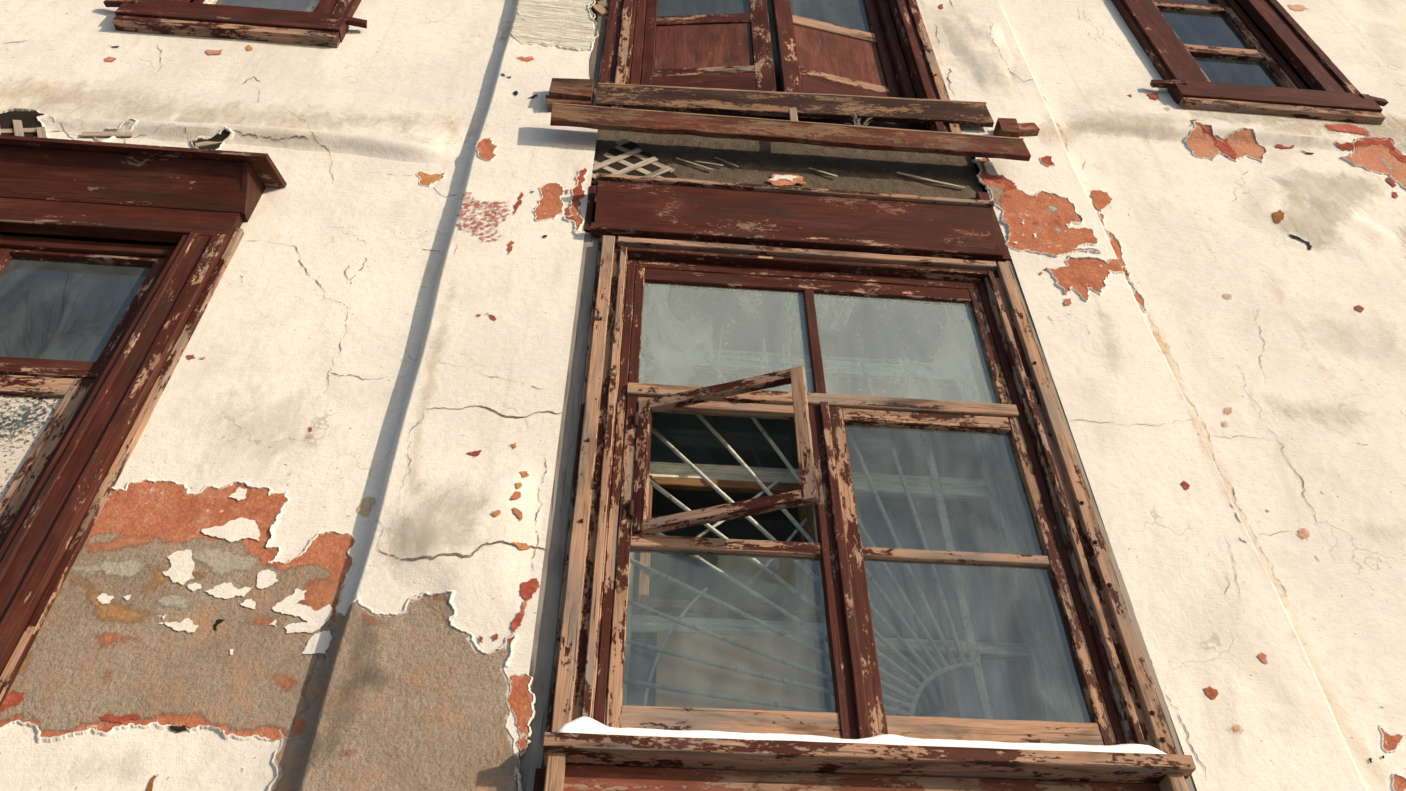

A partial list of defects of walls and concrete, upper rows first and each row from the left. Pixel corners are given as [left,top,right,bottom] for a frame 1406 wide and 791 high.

spalling [586,0,609,27]
peeling [457,167,589,254]
peeling [971,158,1167,353]
peeling [1183,112,1315,164]
peeling [1272,121,1406,250]
crack [254,240,404,399]
crack [374,457,548,570]
crack [401,362,564,488]
crack [1070,312,1319,605]
peeling [0,471,540,791]
crack [1166,695,1206,772]